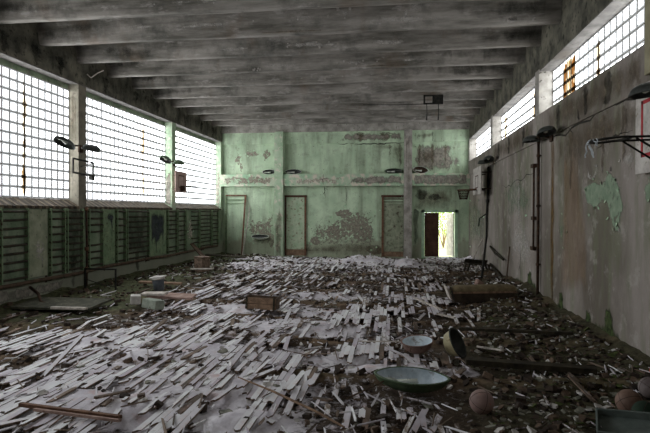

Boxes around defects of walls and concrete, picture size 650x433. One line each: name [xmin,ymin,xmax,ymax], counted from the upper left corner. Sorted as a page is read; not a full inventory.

rust [563,54,576,97]
peeling [412,142,467,185]
peeling [215,168,274,204]
peeling [584,171,623,231]
peeling [306,205,380,251]